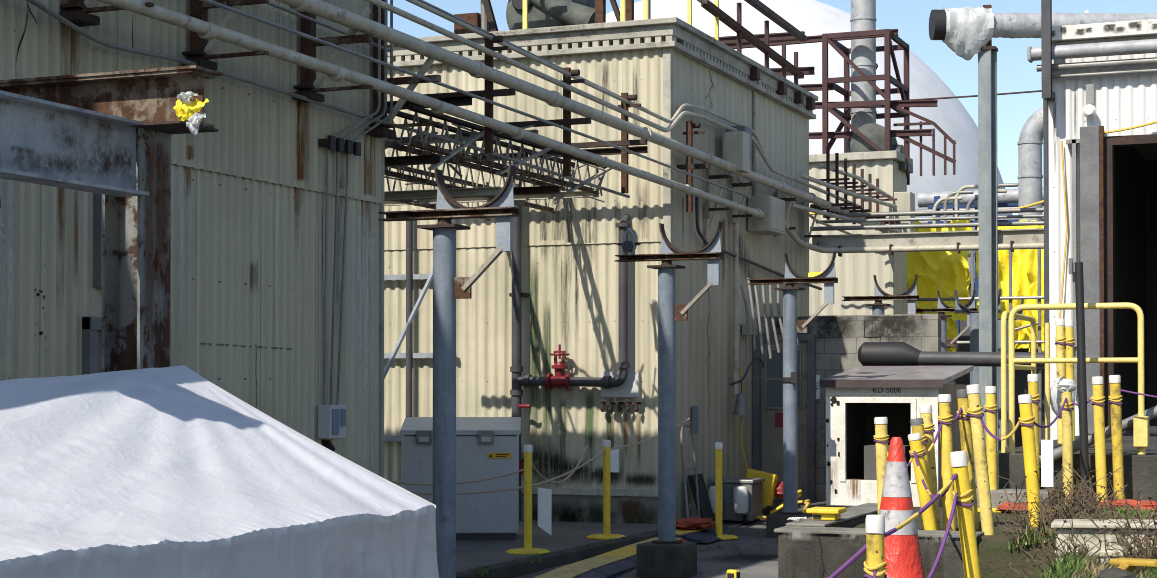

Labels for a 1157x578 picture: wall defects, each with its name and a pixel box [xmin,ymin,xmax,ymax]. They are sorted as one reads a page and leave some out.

corrosion [294,100,305,210]
corrosion [147,144,169,366]
water stain [530,272,565,460]